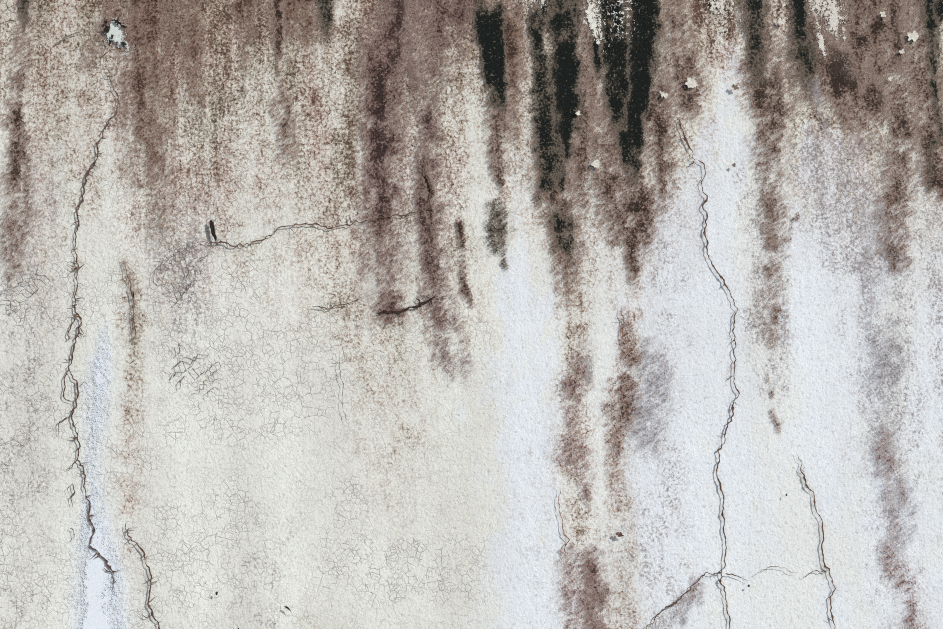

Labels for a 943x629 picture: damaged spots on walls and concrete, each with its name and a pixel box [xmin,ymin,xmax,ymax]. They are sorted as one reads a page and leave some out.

leakage [0,0,38,288]
crack [1,50,119,594]
peeling [103,17,135,56]
leakage [81,0,209,239]
crack [173,344,226,398]
crack [122,163,443,347]
leakage [260,0,324,167]
leakage [352,0,497,379]
leakage [482,98,516,270]
crack [646,114,838,629]
crack [125,524,161,629]